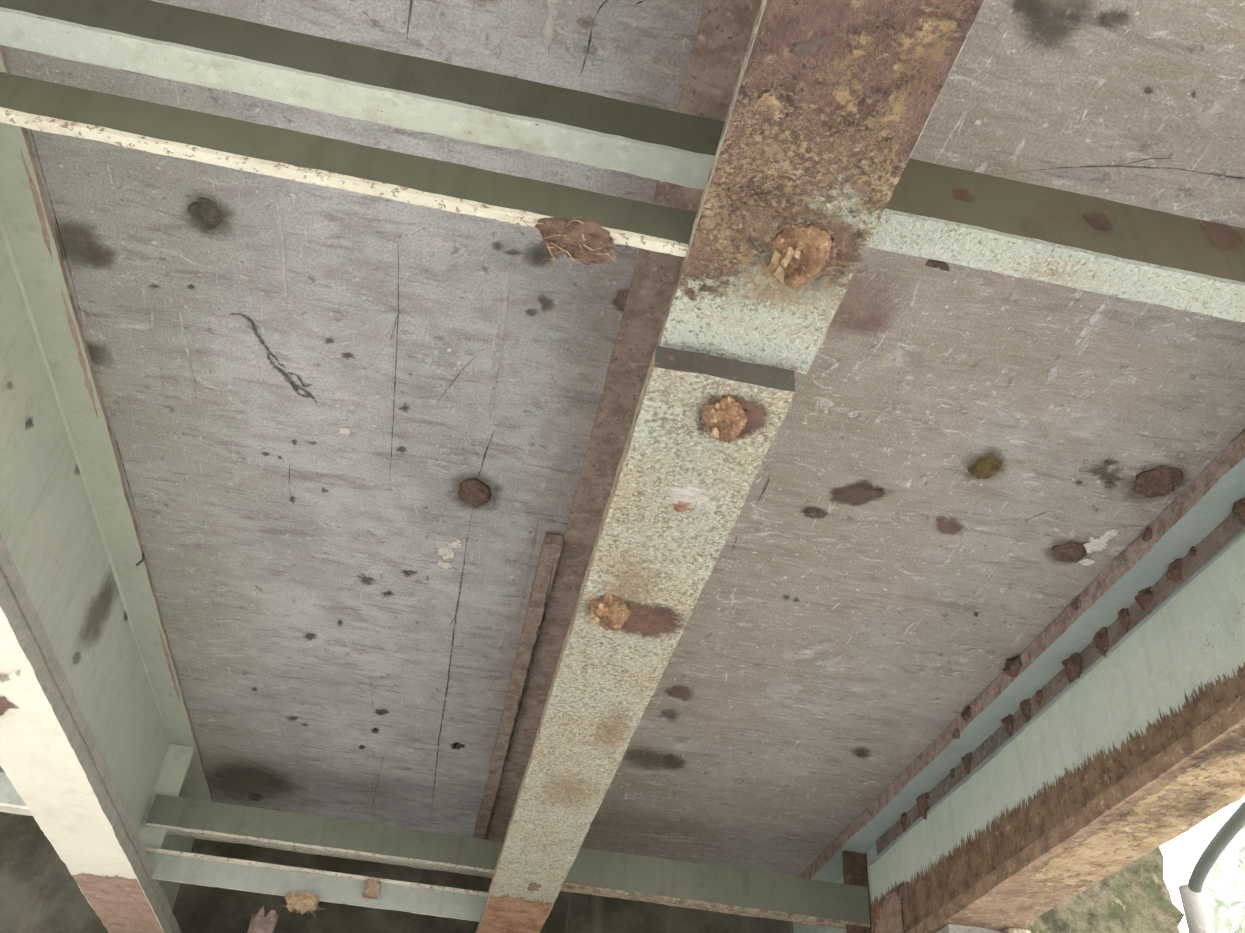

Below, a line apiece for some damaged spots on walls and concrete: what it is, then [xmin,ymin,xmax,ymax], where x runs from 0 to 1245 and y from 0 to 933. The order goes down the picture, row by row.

crack [580,0,643,76]
damp [1016,0,1085,45]
damp [1101,12,1126,26]
corrosion [675,0,984,338]
crack [992,158,1245,179]
corrosion [613,290,629,312]
damp [85,585,111,638]
peeling [0,671,19,716]
crack [430,510,473,817]
corrosion [876,513,1245,855]
damp [629,750,683,775]
corrosion [871,662,1245,933]